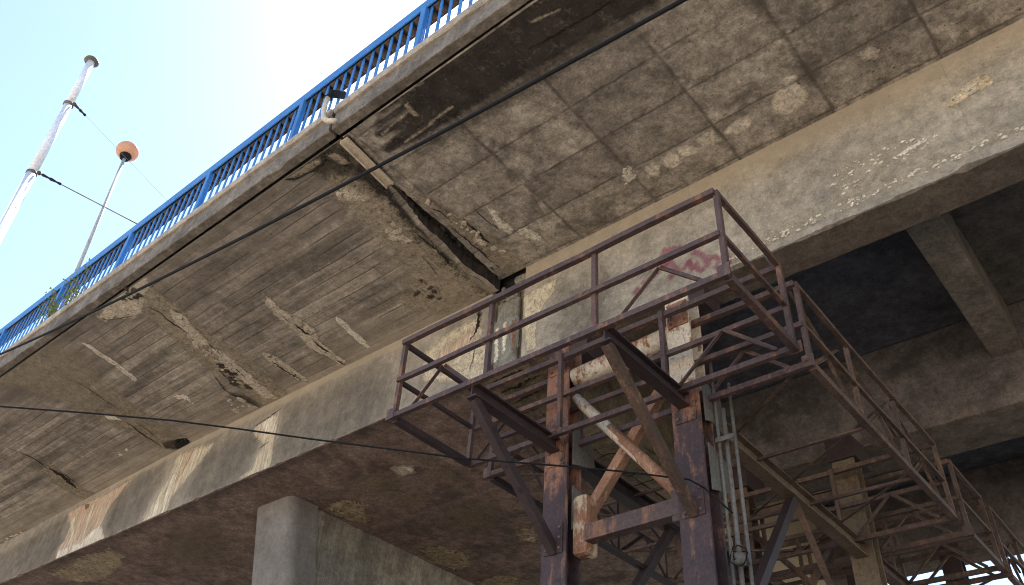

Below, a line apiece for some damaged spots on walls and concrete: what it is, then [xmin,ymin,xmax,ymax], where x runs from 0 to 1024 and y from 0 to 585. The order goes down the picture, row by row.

spalling [947,74,994,107]
water stain [305,0,660,313]
spalling [729,121,1024,264]
spalling [402,184,544,276]
spalling [96,276,150,322]
crack [469,311,481,369]
crack [9,448,95,498]